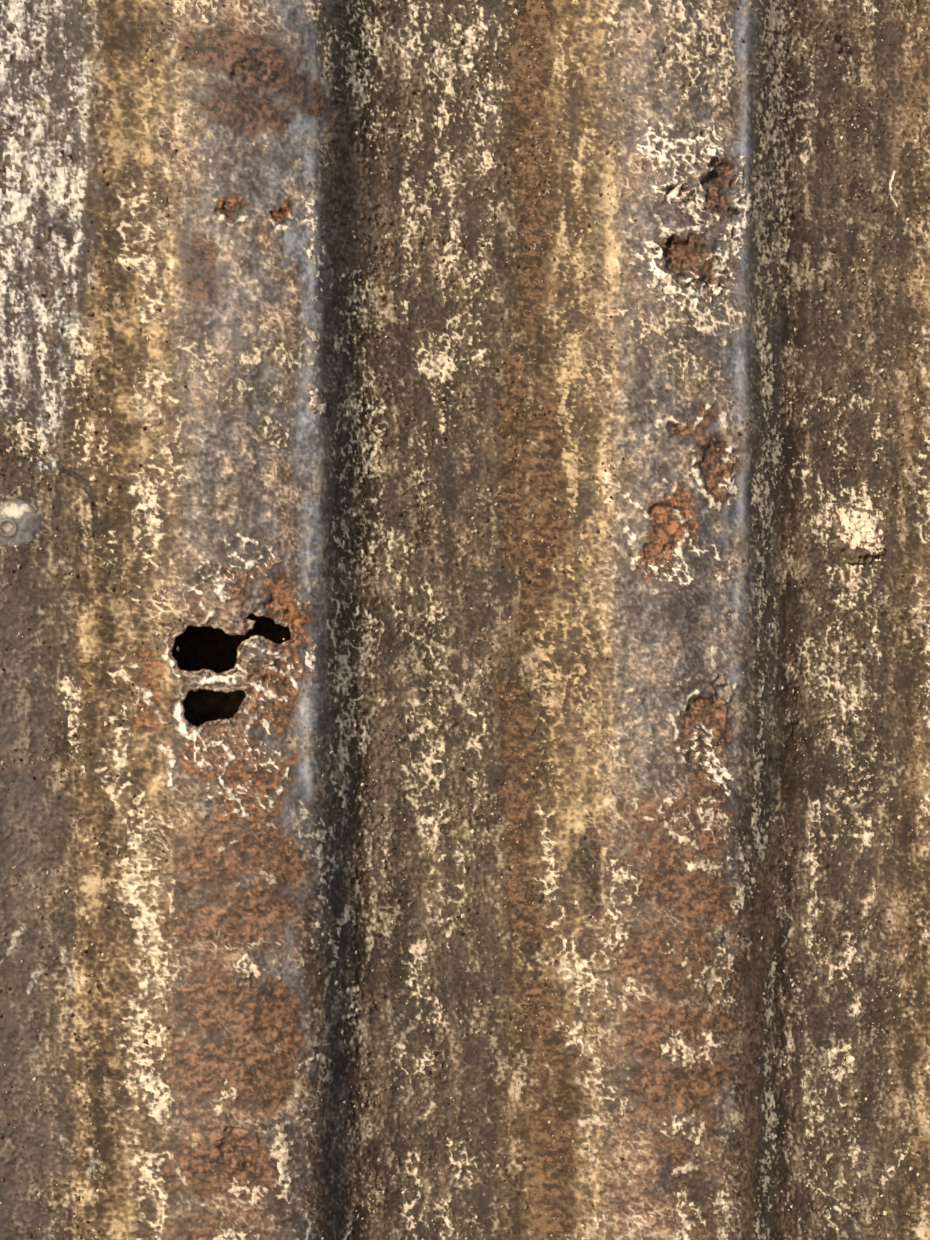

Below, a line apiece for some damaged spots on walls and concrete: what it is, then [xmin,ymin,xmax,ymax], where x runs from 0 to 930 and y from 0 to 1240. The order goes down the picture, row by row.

rust [272,197,293,222]
rust [663,161,735,216]
rust [650,234,727,298]
rust [636,402,740,581]
rust [130,550,313,946]
rust [611,689,742,1240]
rust [152,970,303,1110]
rust [163,1125,279,1198]
rust [169,1210,266,1240]